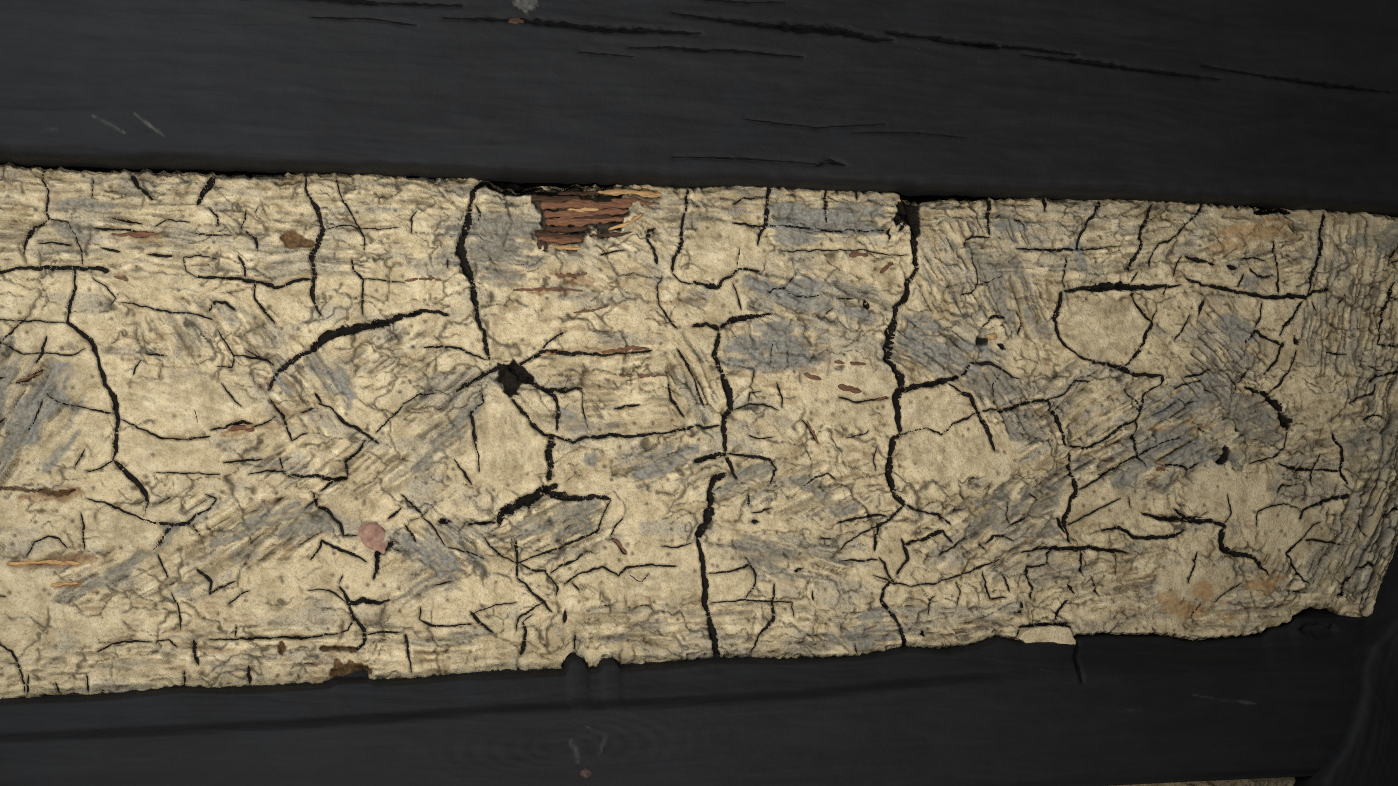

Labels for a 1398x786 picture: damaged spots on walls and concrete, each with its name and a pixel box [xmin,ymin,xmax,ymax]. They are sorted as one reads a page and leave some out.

spalling [487,185,662,251]
crack [0,119,1398,693]